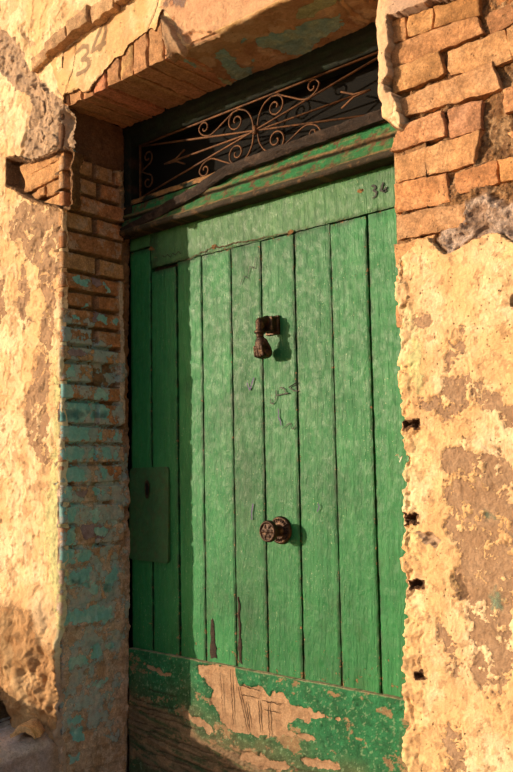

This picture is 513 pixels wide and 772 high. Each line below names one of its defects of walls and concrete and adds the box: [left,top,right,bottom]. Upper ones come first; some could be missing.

peeling [240,0,345,56]
flaking render [391,0,513,266]
peeling [0,0,277,742]
peeling [413,314,432,329]
peeling [401,325,513,432]
peeling [403,446,513,707]
peeling [185,664,340,741]